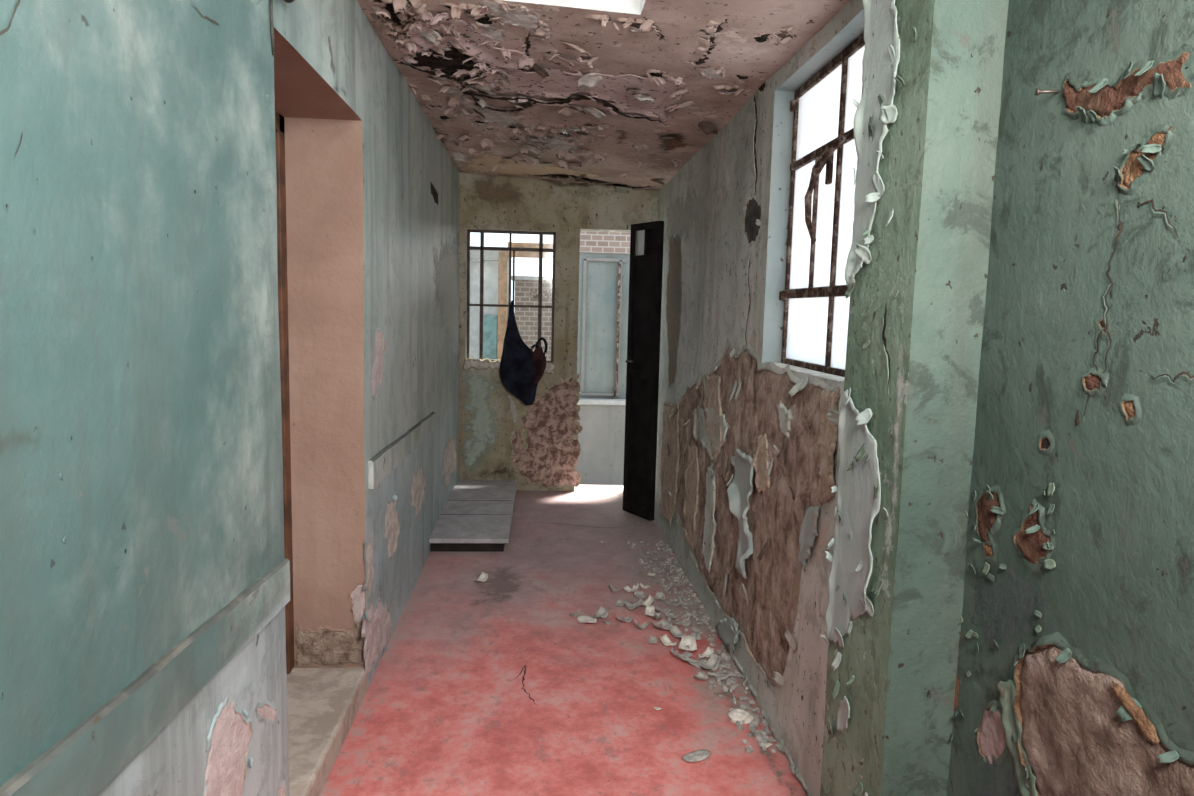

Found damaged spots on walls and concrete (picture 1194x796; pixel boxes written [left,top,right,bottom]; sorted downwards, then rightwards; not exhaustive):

crack [0,0,20,35]
peeling [366,0,695,180]
crack [450,33,666,124]
crack [637,17,665,41]
crack [684,14,728,71]
peeling [844,0,916,299]
flaking render [1059,44,1194,126]
crack [1075,183,1178,426]
flaking render [509,361,583,488]
crack [1149,371,1194,387]
flaking render [661,342,888,796]
flaking render [954,610,1194,796]